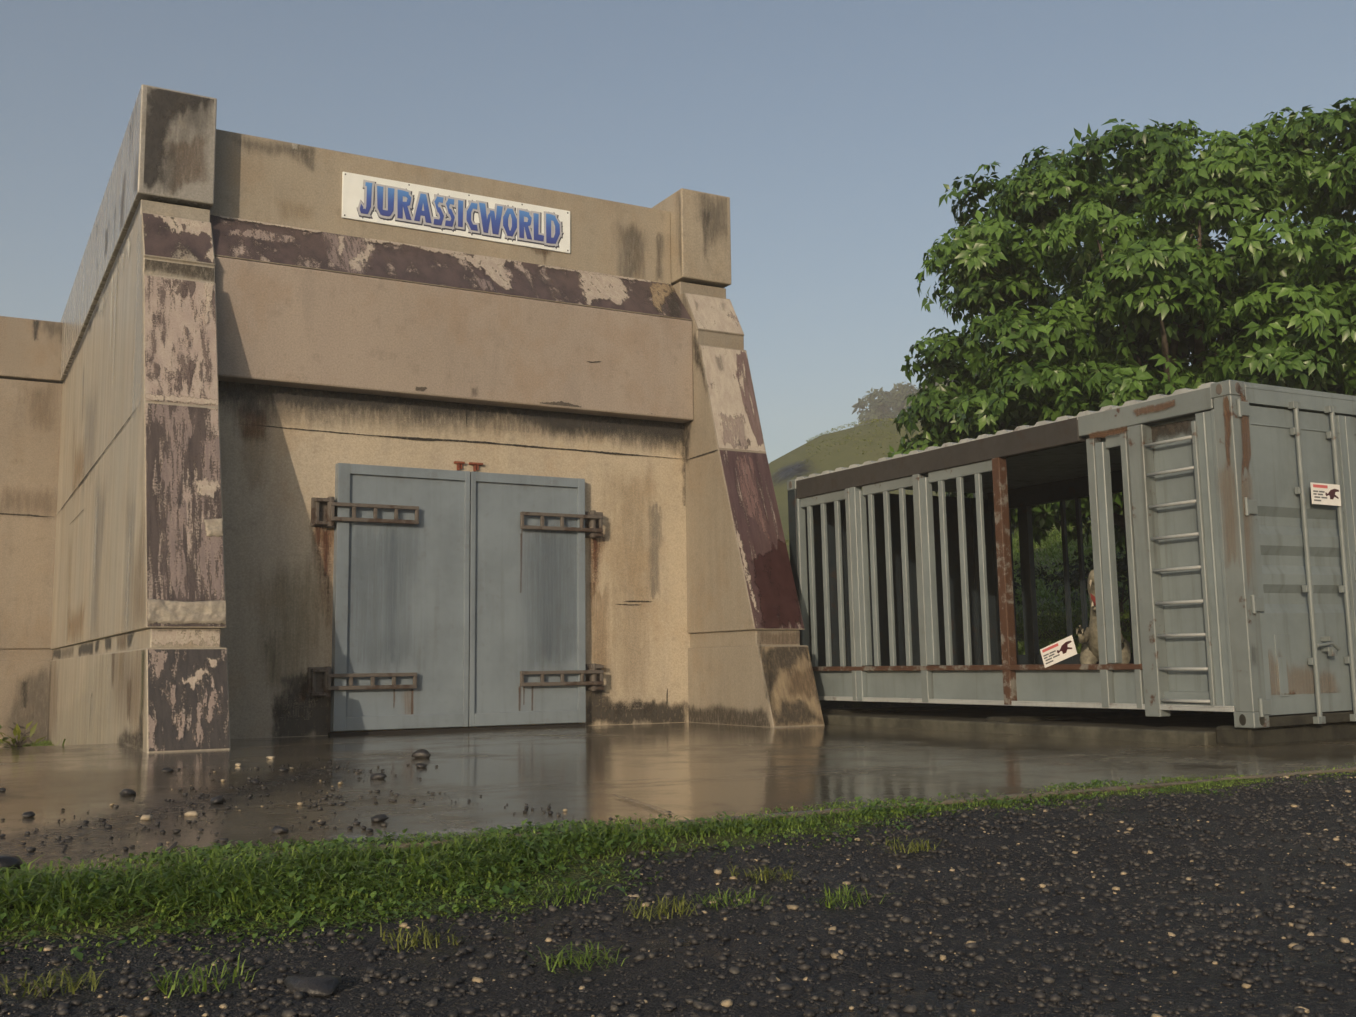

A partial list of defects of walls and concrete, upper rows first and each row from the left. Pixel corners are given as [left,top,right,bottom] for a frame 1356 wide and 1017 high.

damp [64,89,214,383]
peeling [143,213,744,334]
peeling [145,275,230,751]
corrosion [315,527,333,608]
peeling [700,345,804,629]
damp [273,674,331,737]
damp [587,645,770,727]
peeling [759,647,824,726]